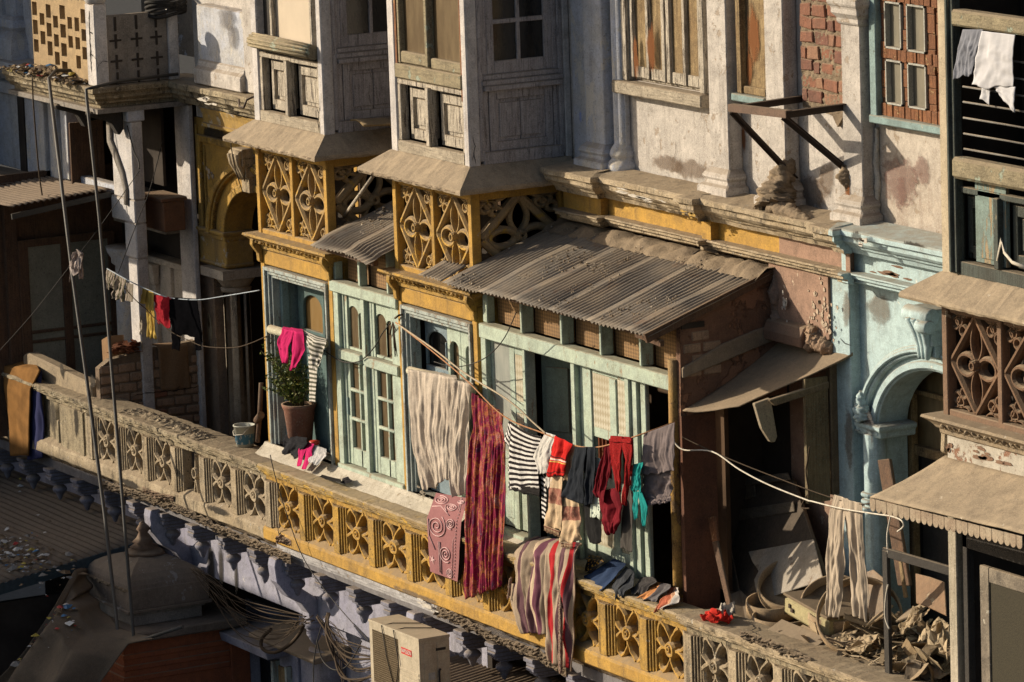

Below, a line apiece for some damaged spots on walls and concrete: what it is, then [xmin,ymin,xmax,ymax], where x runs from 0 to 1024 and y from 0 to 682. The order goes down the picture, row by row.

corrosion [746,8,759,85]
spalling [803,277,839,355]
peeling [972,446,1013,466]